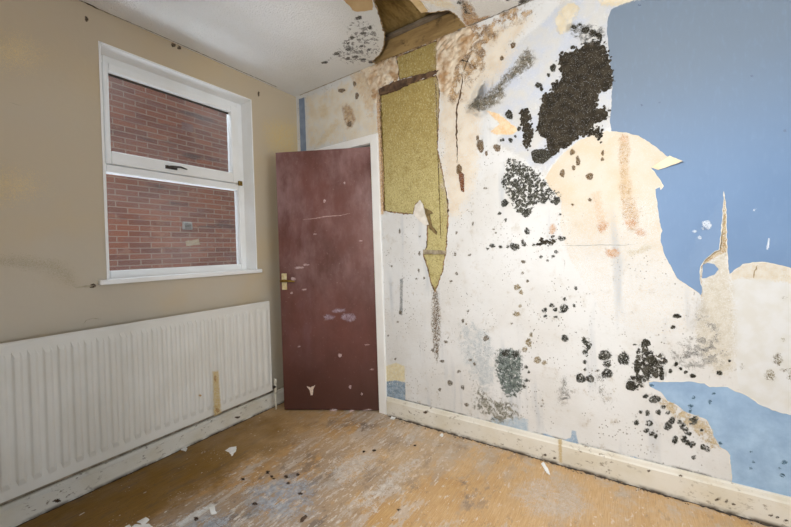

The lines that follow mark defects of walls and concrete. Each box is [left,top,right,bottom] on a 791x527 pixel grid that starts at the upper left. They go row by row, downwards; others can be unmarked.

leakage [322,15,380,64]
leakage [261,72,382,158]
spalling [361,0,475,362]
leakage [427,0,615,262]
leakage [438,310,547,425]
leakage [557,313,731,460]